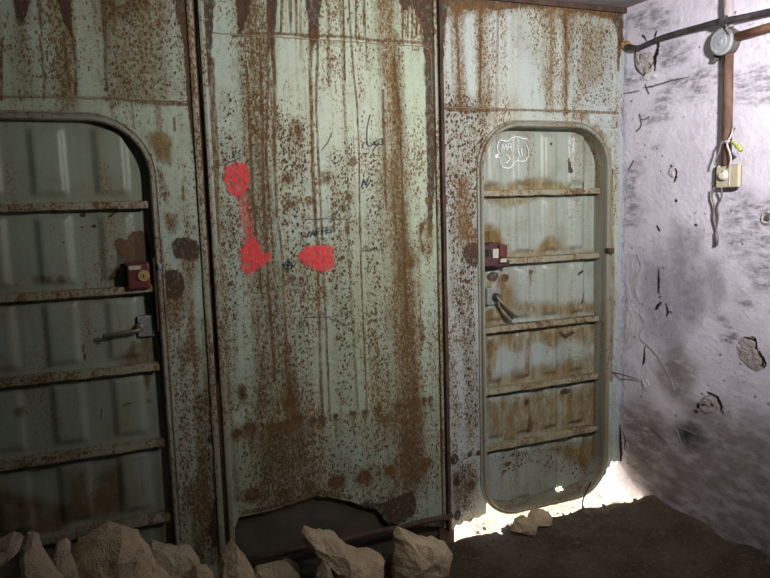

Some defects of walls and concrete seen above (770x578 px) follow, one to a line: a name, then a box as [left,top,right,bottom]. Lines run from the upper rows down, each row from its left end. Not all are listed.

corrosion [13,0,48,101]
corrosion [52,0,78,110]
flaking render [634,31,660,81]
corrosion [92,0,624,565]
crack [655,270,671,316]
crack [639,338,675,390]
flaking render [737,336,767,371]
flaking render [694,391,724,414]